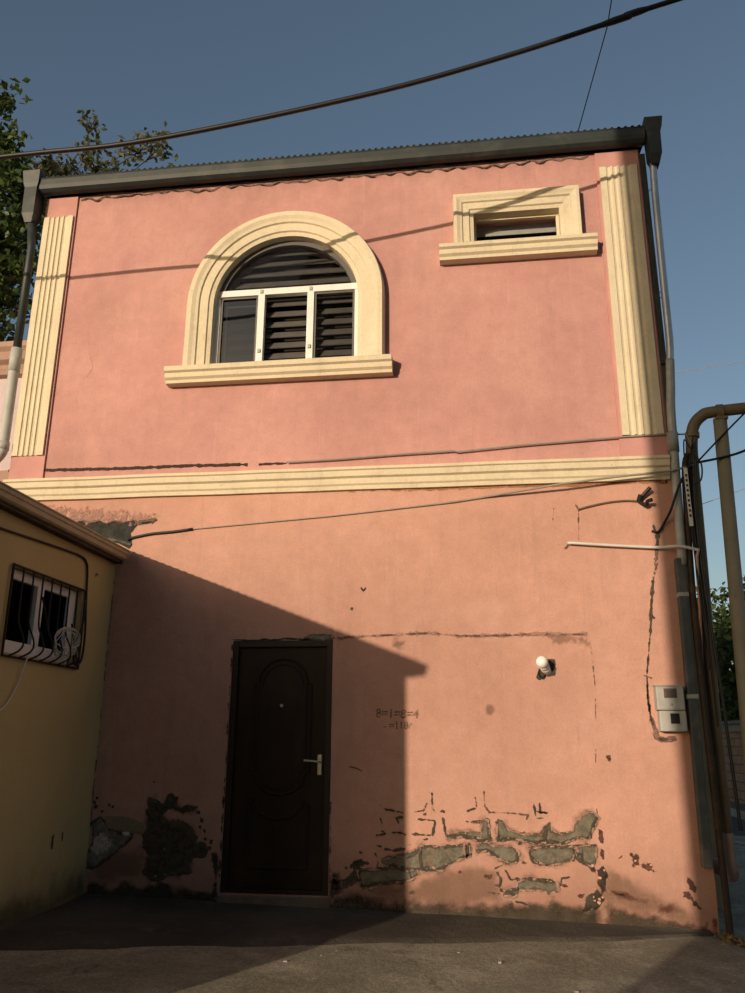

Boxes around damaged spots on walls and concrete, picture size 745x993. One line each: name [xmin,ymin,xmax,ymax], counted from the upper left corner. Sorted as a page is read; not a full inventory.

crack [44,462,286,472]
spalling [54,506,156,549]
crack [332,631,584,639]
crack [644,524,677,742]
crack [219,637,302,877]
spalling [86,793,219,897]
crack [350,791,548,869]
spalling [330,811,608,911]
peeling [683,878,701,910]